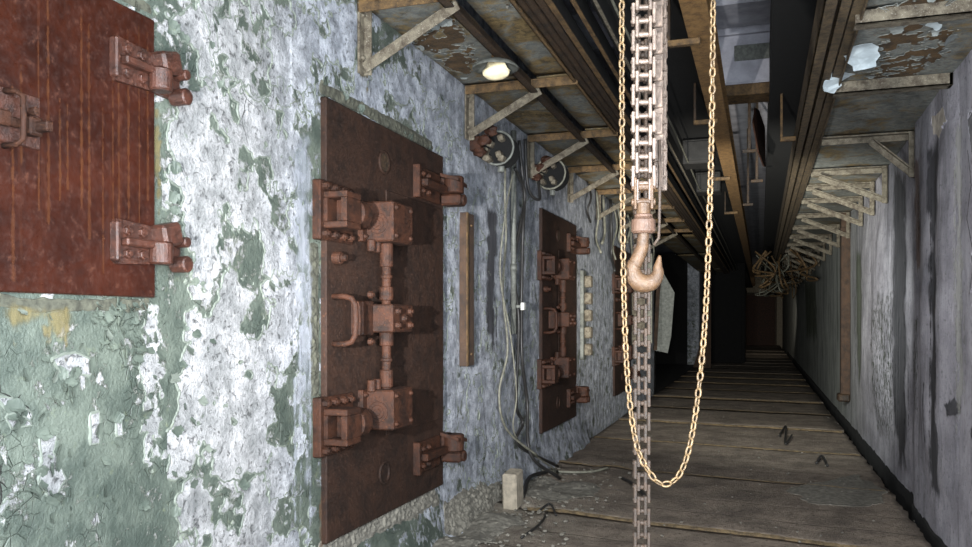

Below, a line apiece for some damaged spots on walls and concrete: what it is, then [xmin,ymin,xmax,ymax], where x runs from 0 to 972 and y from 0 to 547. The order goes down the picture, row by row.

peeling [823,22,960,93]
peeling [876,0,956,12]
peeling [0,0,526,547]
peeling [516,196,537,452]
leakage [855,140,961,494]